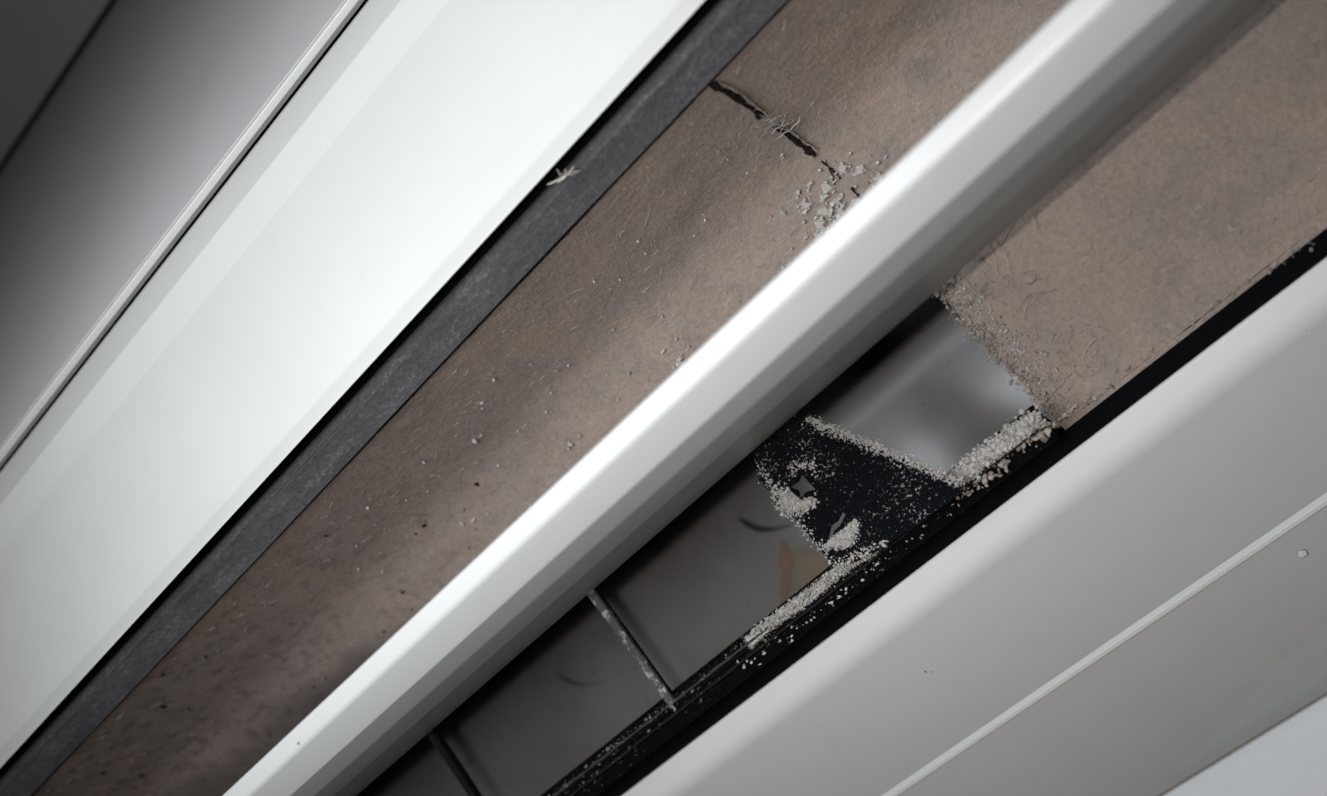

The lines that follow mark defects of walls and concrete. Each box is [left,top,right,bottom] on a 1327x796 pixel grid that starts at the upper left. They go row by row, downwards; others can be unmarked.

crack [709,80,861,198]
peeling [801,229,1315,516]